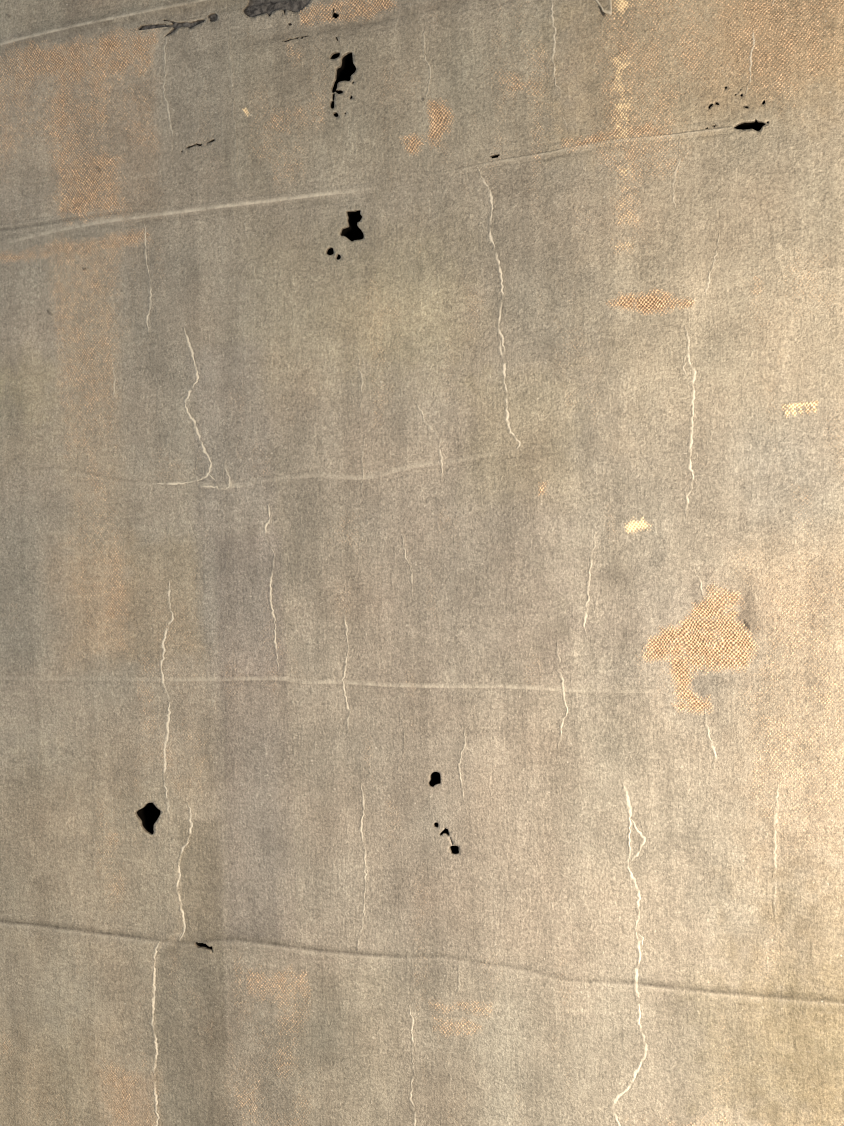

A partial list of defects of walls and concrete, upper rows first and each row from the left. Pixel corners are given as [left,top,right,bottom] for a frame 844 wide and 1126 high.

peeling [244,0,311,26]
crack [156,327,232,492]
crack [149,581,196,1126]
crack [608,782,652,1126]